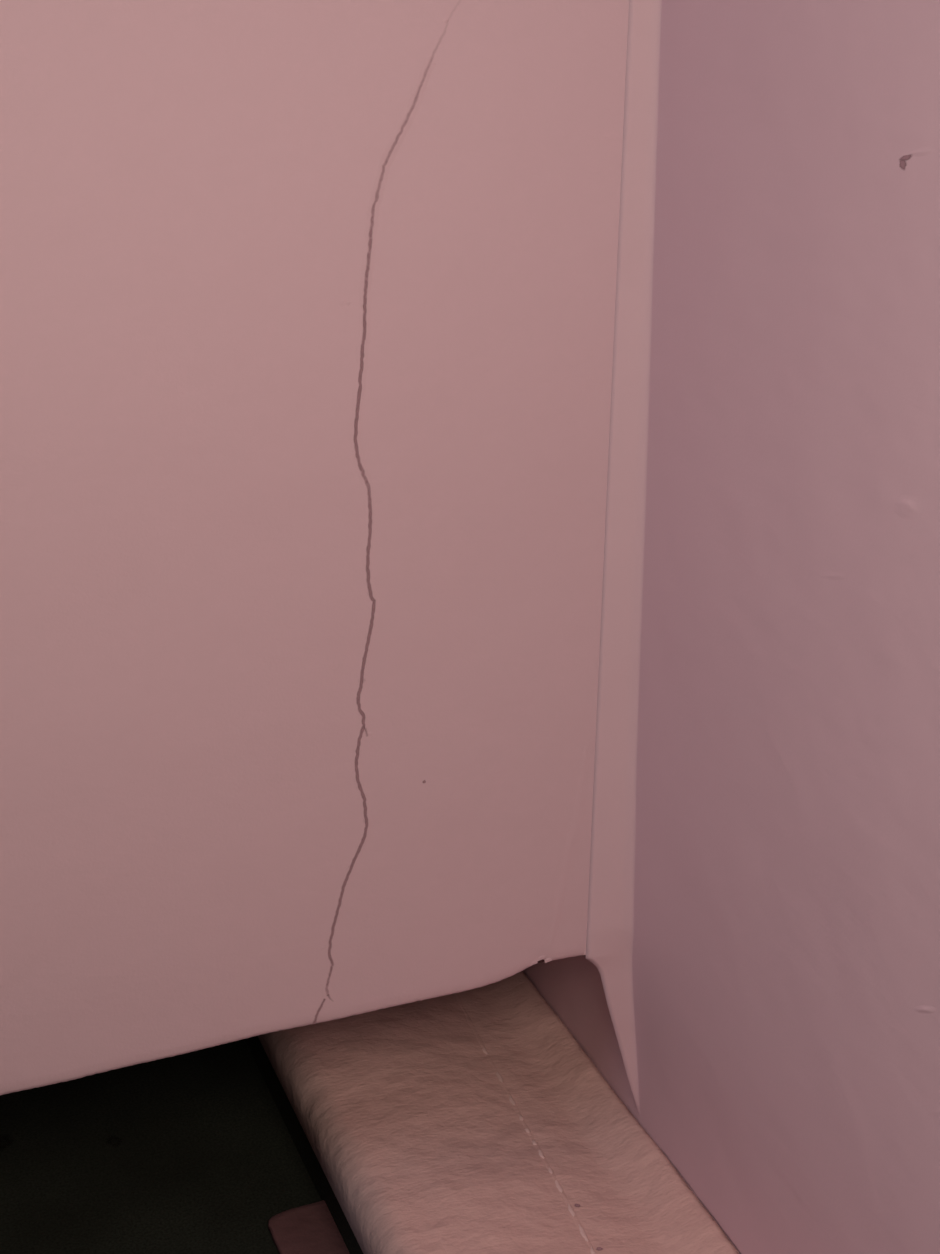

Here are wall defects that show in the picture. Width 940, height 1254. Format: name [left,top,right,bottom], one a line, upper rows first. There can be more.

crack [313,55,436,1024]